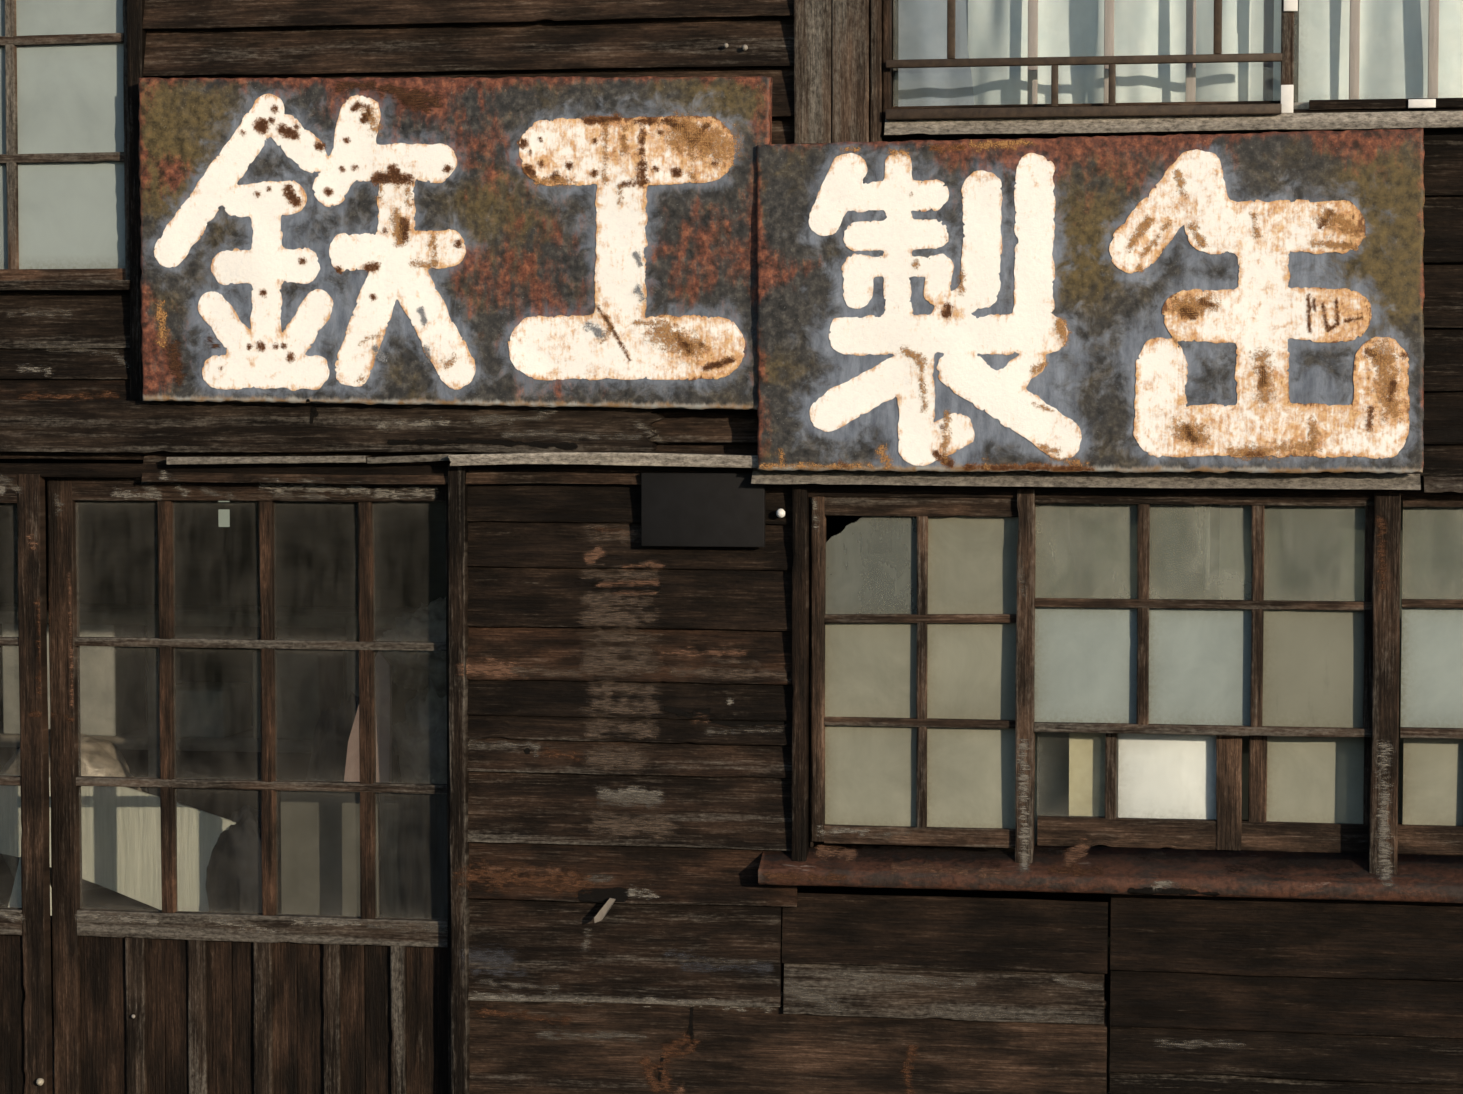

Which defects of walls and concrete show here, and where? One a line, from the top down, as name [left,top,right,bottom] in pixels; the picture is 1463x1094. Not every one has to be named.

rust [240,105,351,151]
rust [517,113,743,204]
rust [255,184,302,207]
rust [339,164,415,247]
rust [1128,216,1206,272]
rust [247,341,295,362]
peeling [584,322,605,337]
rust [633,315,736,371]
rust [900,348,1094,473]
rust [1172,293,1219,320]
rust [1250,349,1276,403]
rust [1364,339,1409,432]